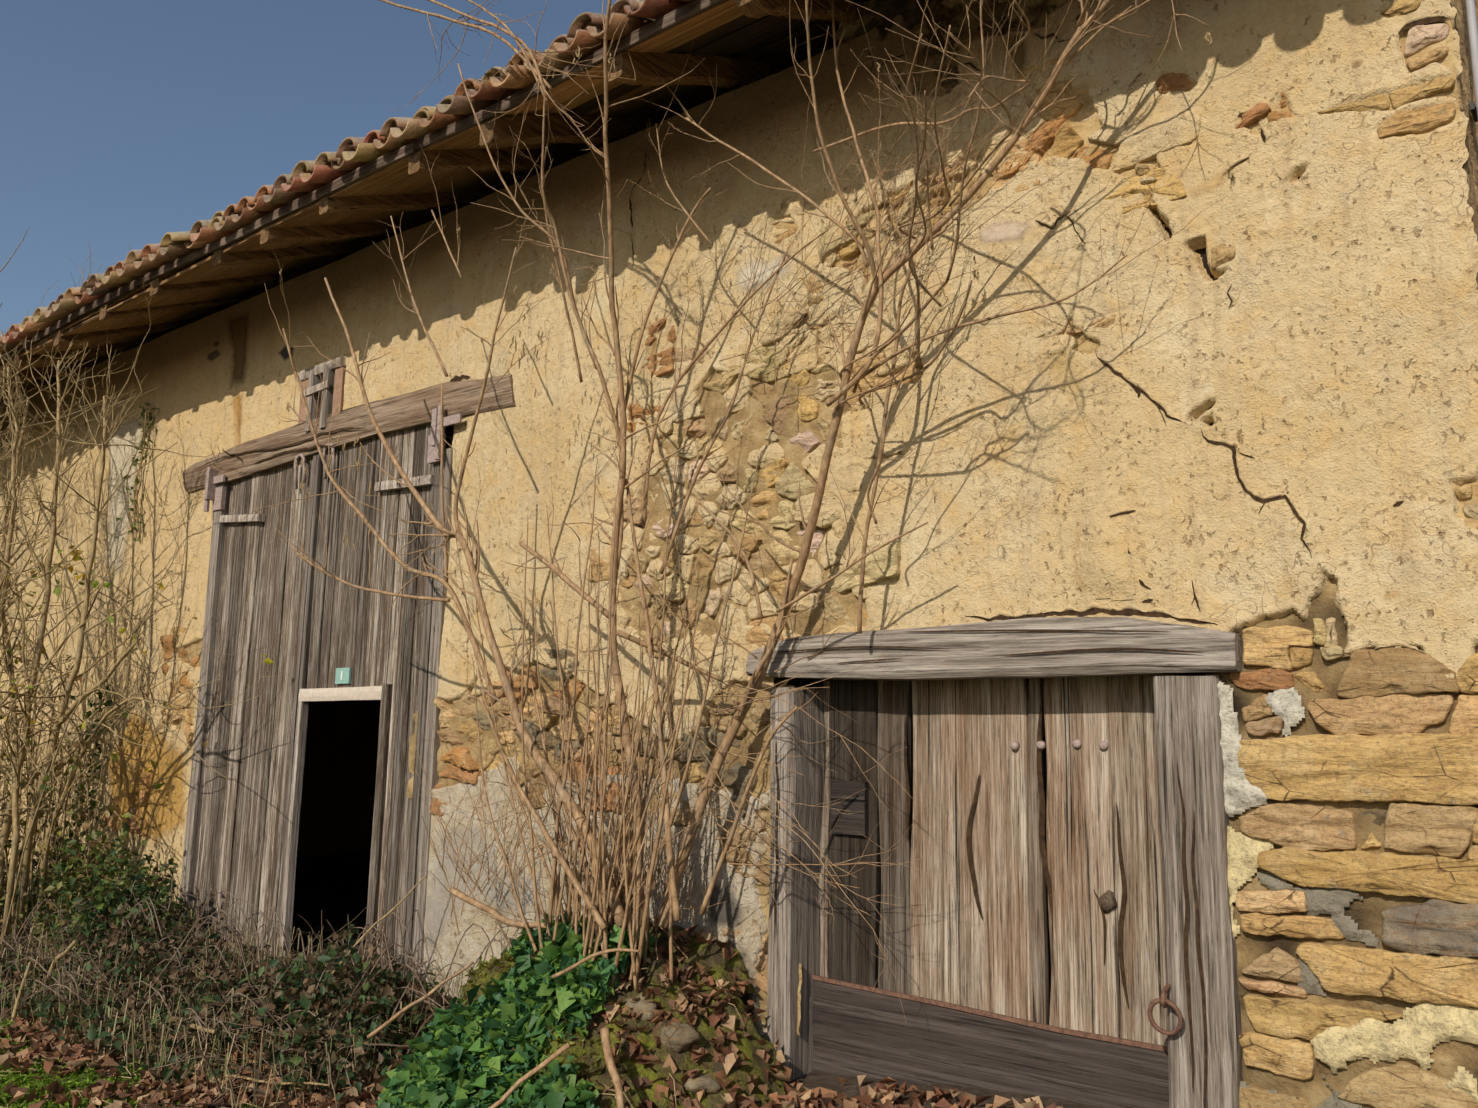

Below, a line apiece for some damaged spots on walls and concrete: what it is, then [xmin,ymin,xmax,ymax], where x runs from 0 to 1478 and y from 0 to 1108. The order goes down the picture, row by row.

spalling [1235,92,1292,136]
spalling [1317,0,1460,139]
spalling [407,52,1201,1029]
crack [1094,348,1313,558]
spalling [1205,579,1478,1108]